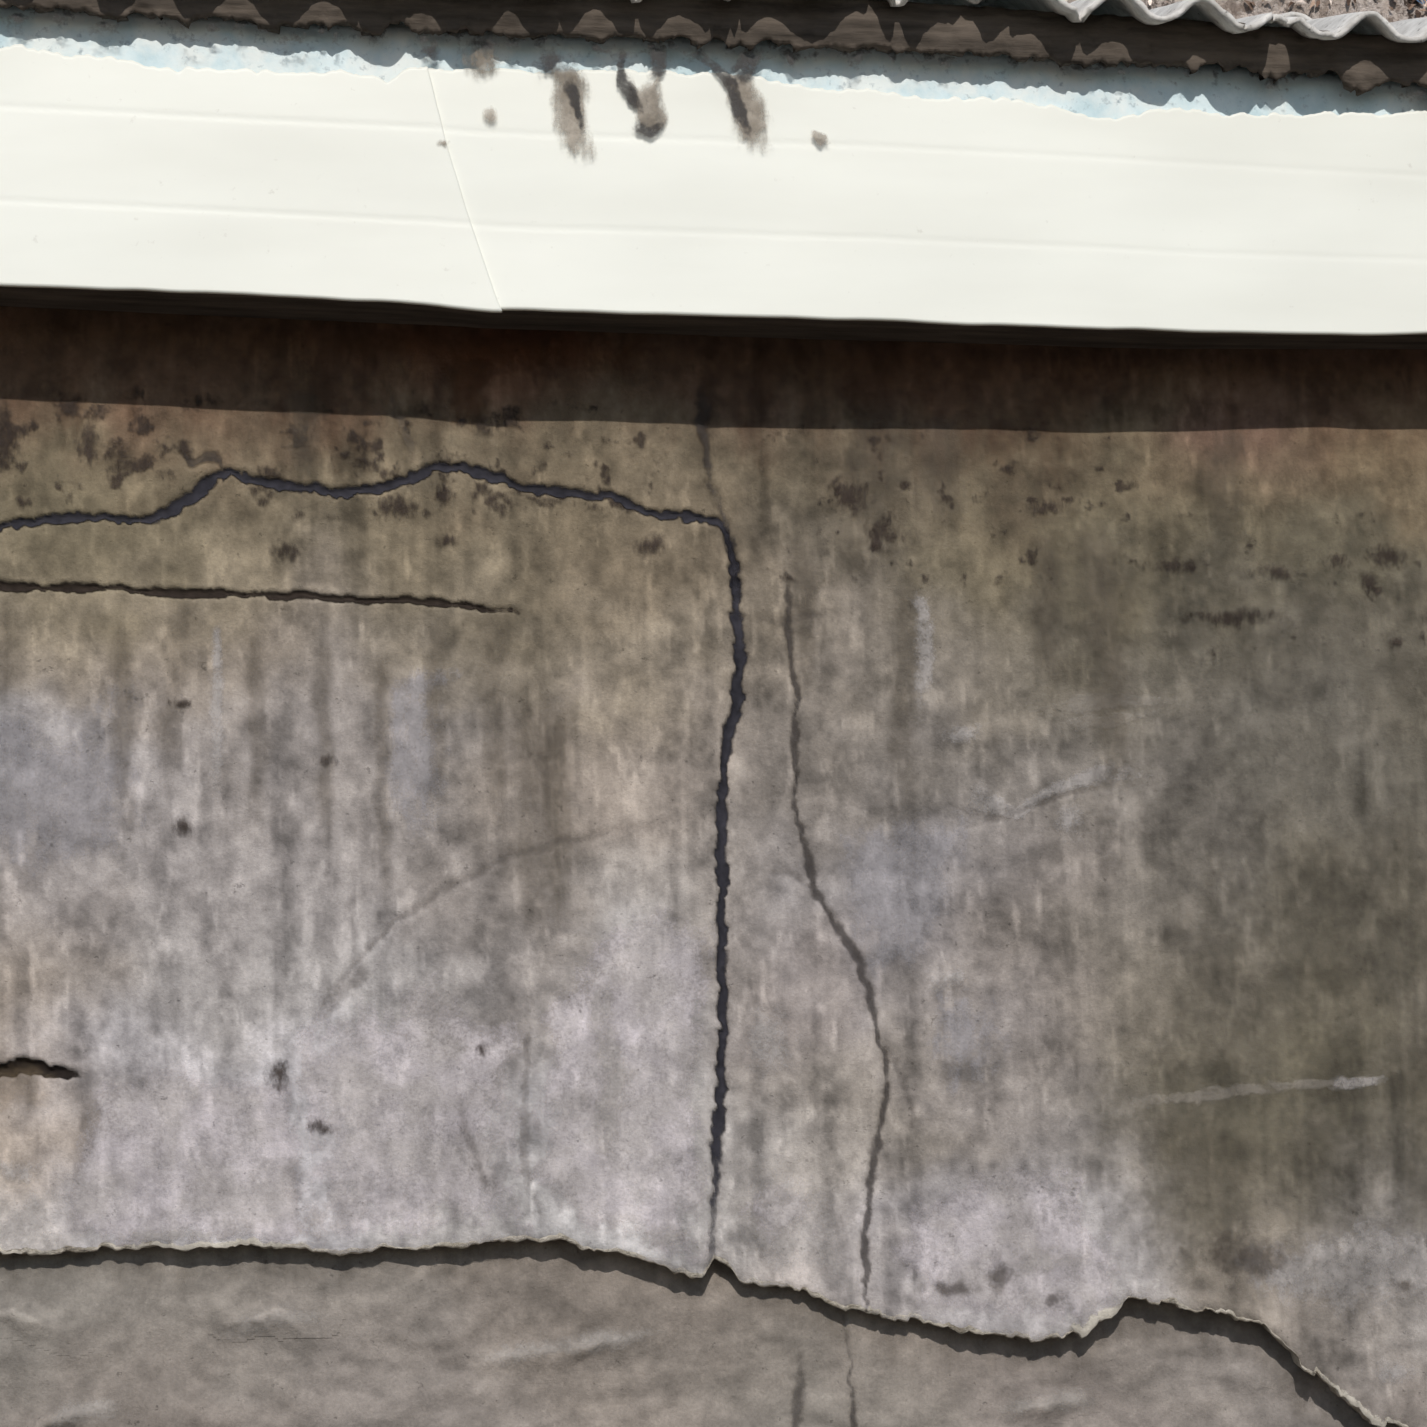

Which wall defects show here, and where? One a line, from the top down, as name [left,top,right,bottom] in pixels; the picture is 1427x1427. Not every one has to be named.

leakage [0,412,38,471]
leakage [56,391,191,488]
leakage [335,421,398,478]
leakage [381,460,449,514]
leakage [473,458,563,513]
crack [696,396,711,468]
leakage [915,599,932,689]
crack [0,452,747,1227]
crack [785,587,889,1311]
peeling [0,915,1427,1427]
crack [794,1384,802,1427]
crack [850,1401,858,1427]